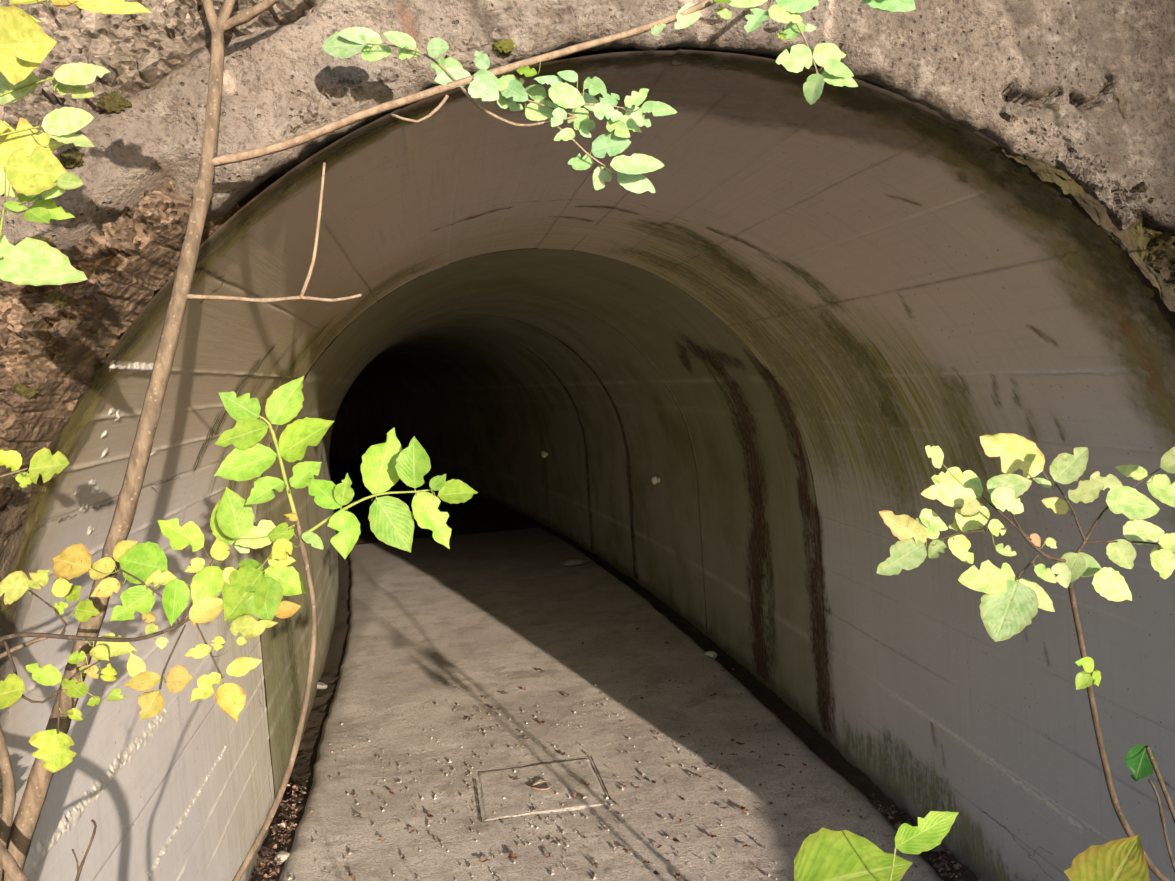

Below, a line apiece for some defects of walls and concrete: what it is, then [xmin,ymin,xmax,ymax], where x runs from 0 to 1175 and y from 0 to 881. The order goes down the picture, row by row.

spalling [200,203,242,245]
damp [191,88,470,288]
damp [498,54,1175,434]
spalling [982,99,1175,331]
spalling [0,179,193,520]
damp [51,280,174,456]
damp [632,223,905,491]
peeling [74,479,99,536]
damp [846,729,1017,881]